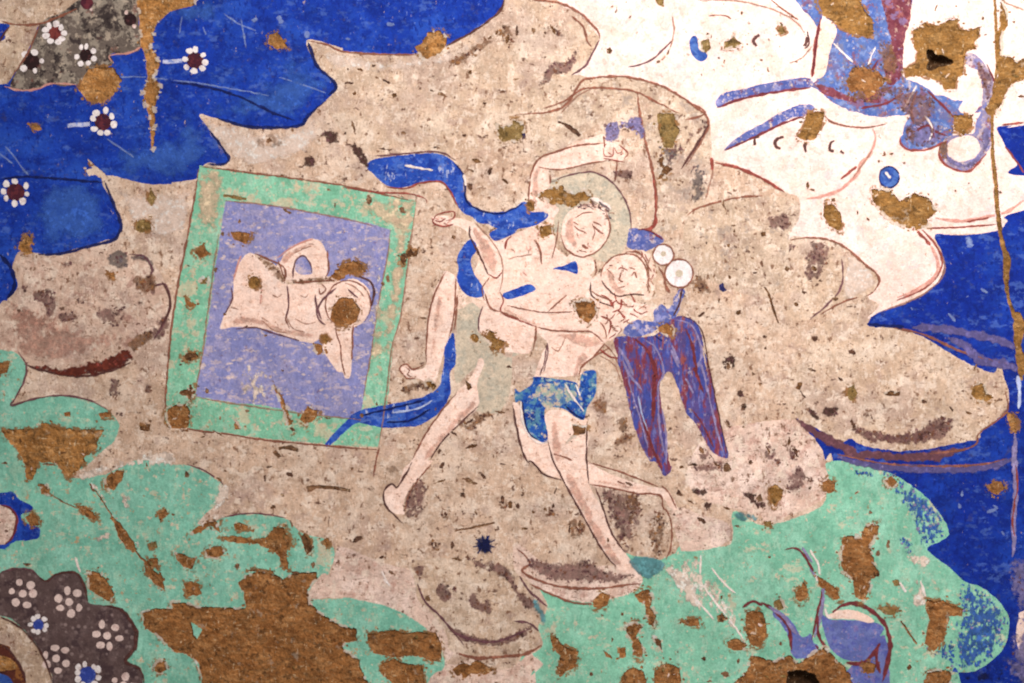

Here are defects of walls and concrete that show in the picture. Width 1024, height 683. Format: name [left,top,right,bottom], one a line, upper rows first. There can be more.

peeling [74,64,124,106]
peeling [137,0,197,153]
peeling [841,0,1024,138]
peeling [653,110,680,185]
peeling [796,108,826,144]
peeling [524,180,593,240]
peeling [857,185,939,231]
peeling [312,295,362,355]
peeling [0,409,125,523]
peeling [137,517,497,683]
peeling [707,510,902,683]
peeling [922,595,967,654]